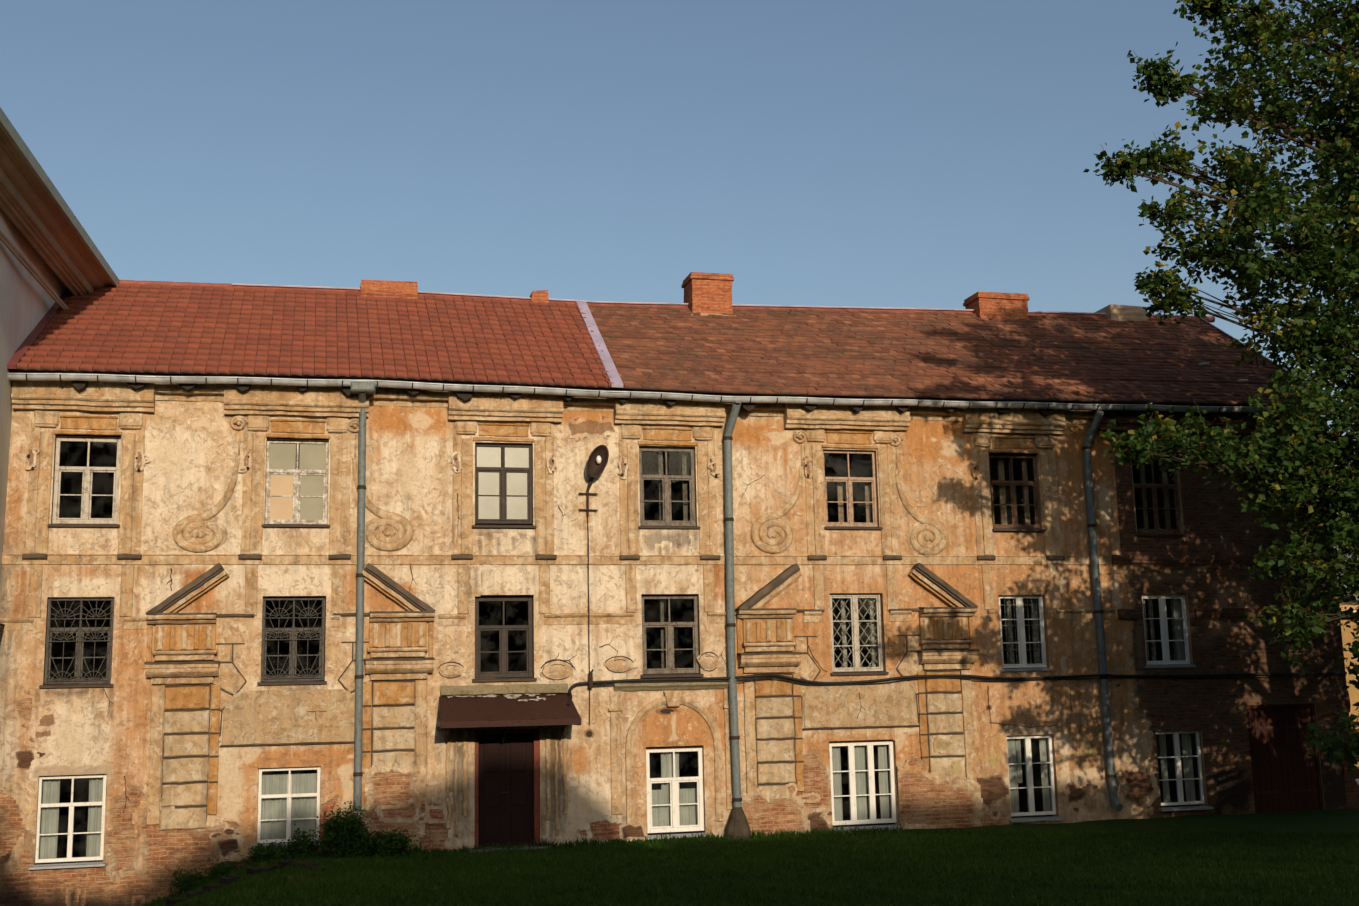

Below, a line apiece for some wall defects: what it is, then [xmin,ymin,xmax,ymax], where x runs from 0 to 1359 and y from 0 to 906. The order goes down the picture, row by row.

flaking render [984,436,1265,819]
flaking render [0,689,267,901]
flaking render [311,752,473,856]
flaking render [730,745,833,836]
flaking render [893,727,1014,828]